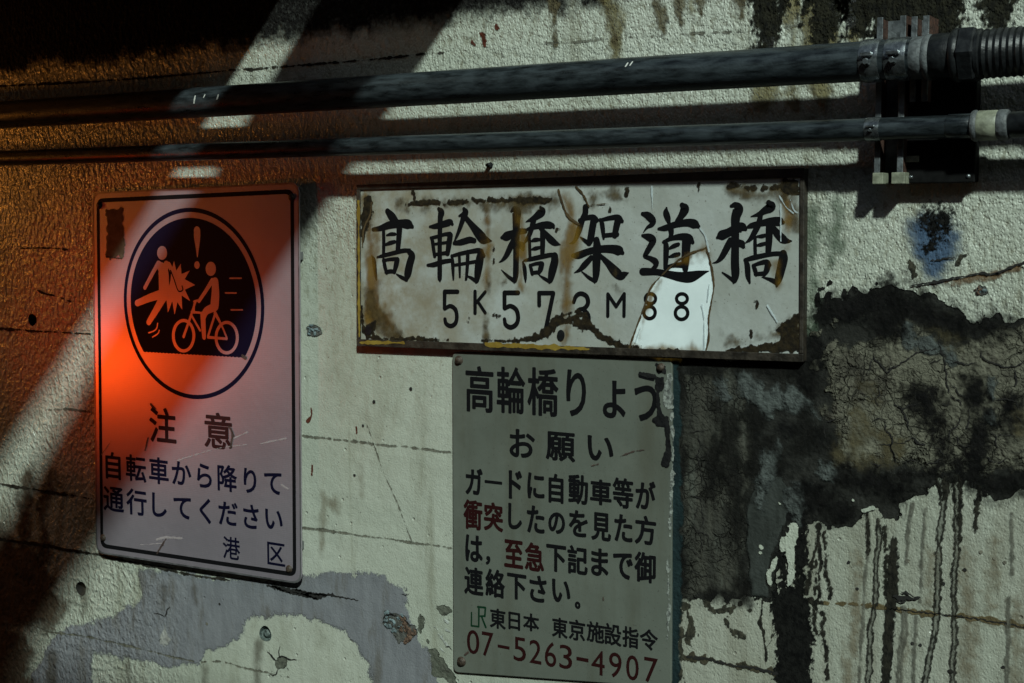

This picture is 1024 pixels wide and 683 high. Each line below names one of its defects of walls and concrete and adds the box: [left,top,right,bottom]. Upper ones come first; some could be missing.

water stain [548,0,560,47]
water stain [601,0,623,58]
water stain [652,0,706,34]
water stain [735,0,1019,49]
water stain [753,85,800,111]
water stain [810,83,831,106]
water stain [807,210,843,263]
crack [910,257,1024,287]
crack [860,336,1024,467]
spalling [668,280,1024,605]
water stain [672,274,1024,683]
spalling [268,647,296,676]